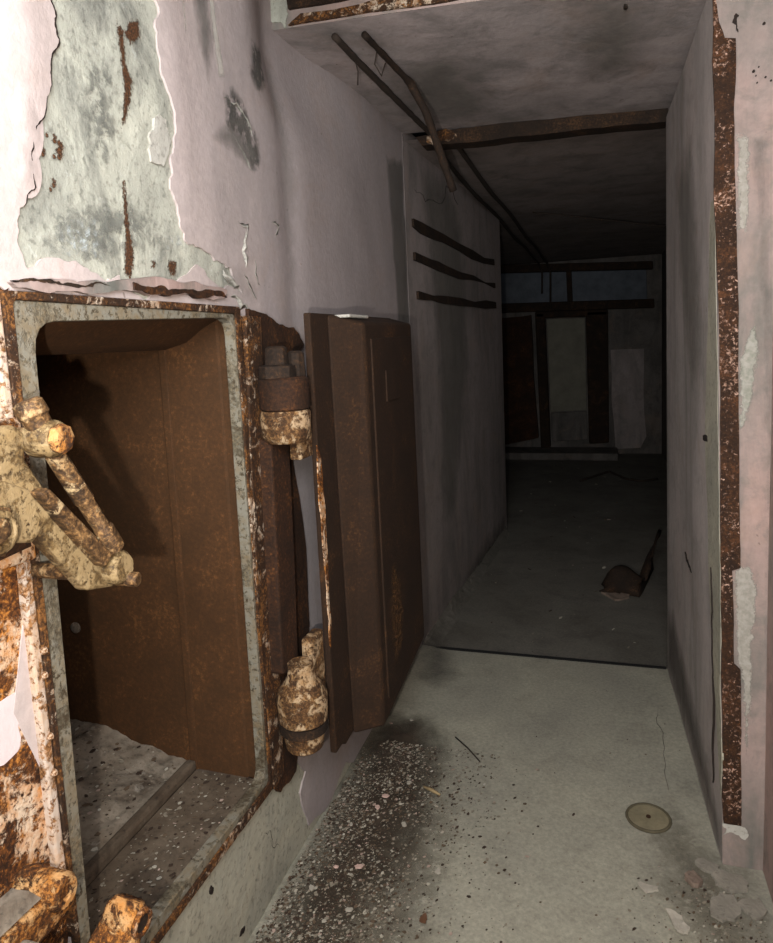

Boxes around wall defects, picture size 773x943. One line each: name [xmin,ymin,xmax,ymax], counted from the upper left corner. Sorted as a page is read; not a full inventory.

peeling [7,0,260,310]
peeling [703,200,724,794]
peeling [734,567,757,745]
peeling [160,763,322,943]